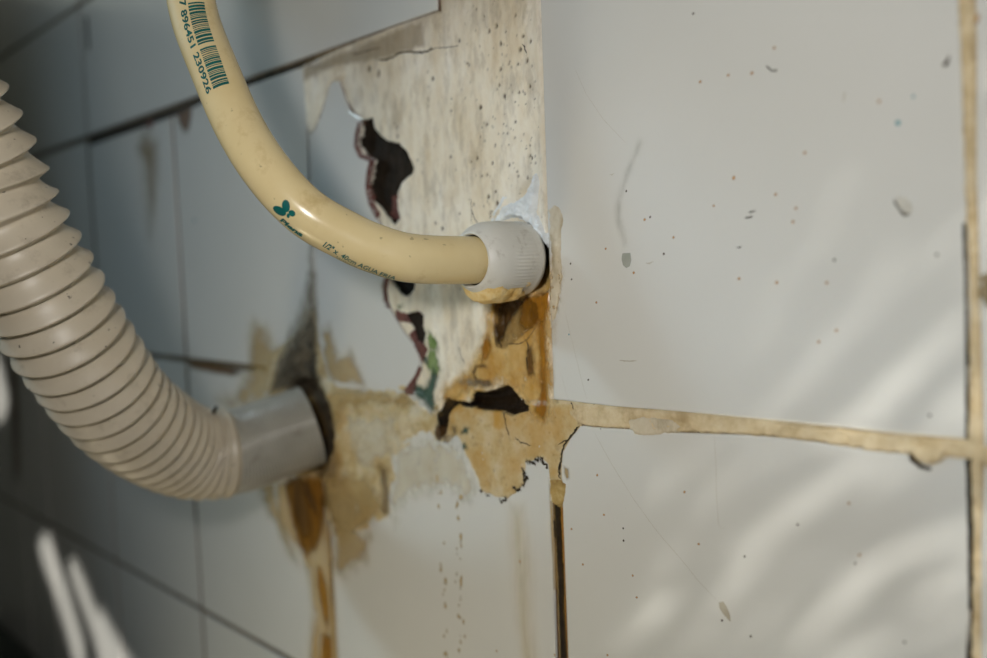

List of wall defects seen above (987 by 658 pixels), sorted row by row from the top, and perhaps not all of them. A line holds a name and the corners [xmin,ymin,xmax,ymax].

crack [352,45,457,62]
spalling [303,0,550,298]
leakage [190,362,239,375]
leakage [238,263,361,455]
spalling [267,278,582,534]
corrosion [437,287,554,419]
corrosion [279,475,337,658]